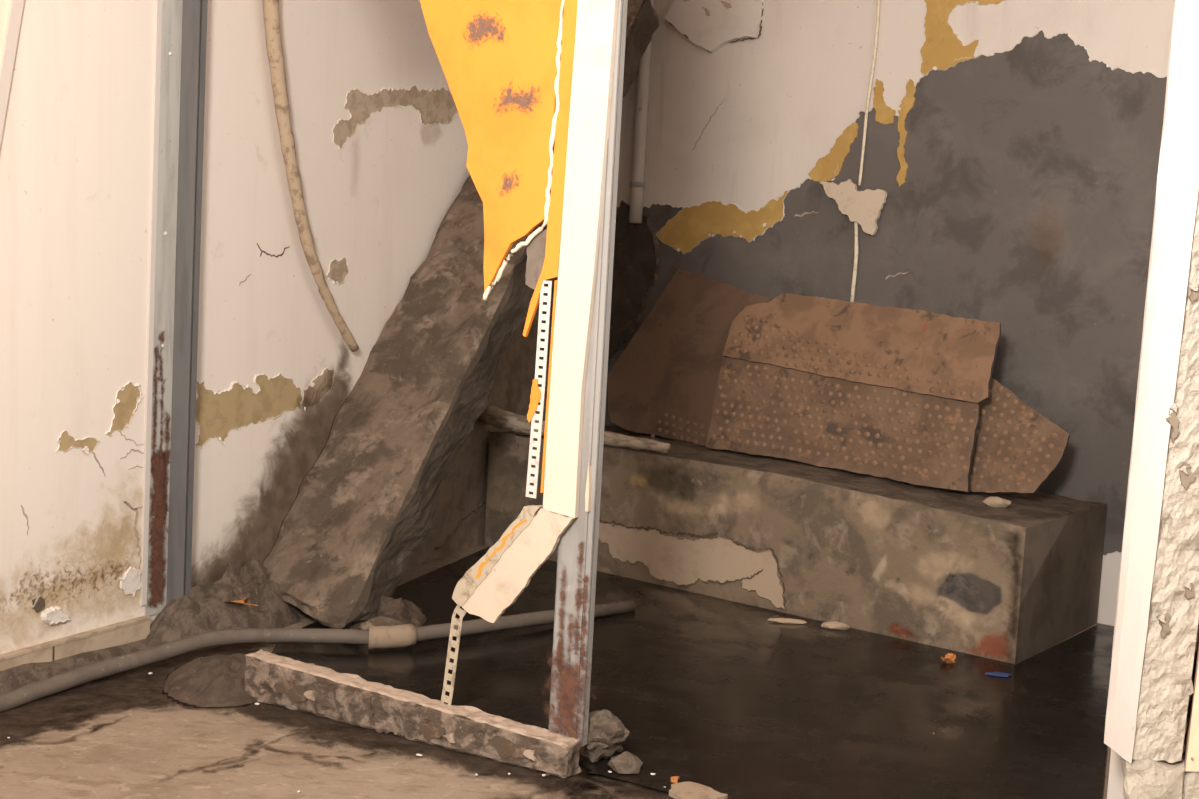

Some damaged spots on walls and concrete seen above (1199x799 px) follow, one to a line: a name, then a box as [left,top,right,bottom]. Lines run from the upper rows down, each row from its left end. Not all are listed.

peeling [332,85,458,149]
peeling [605,0,1167,556]
peeling [55,381,143,455]
peeling [195,368,335,449]
rust [148,333,170,608]
flaking render [598,521,787,611]
rust [545,542,588,744]